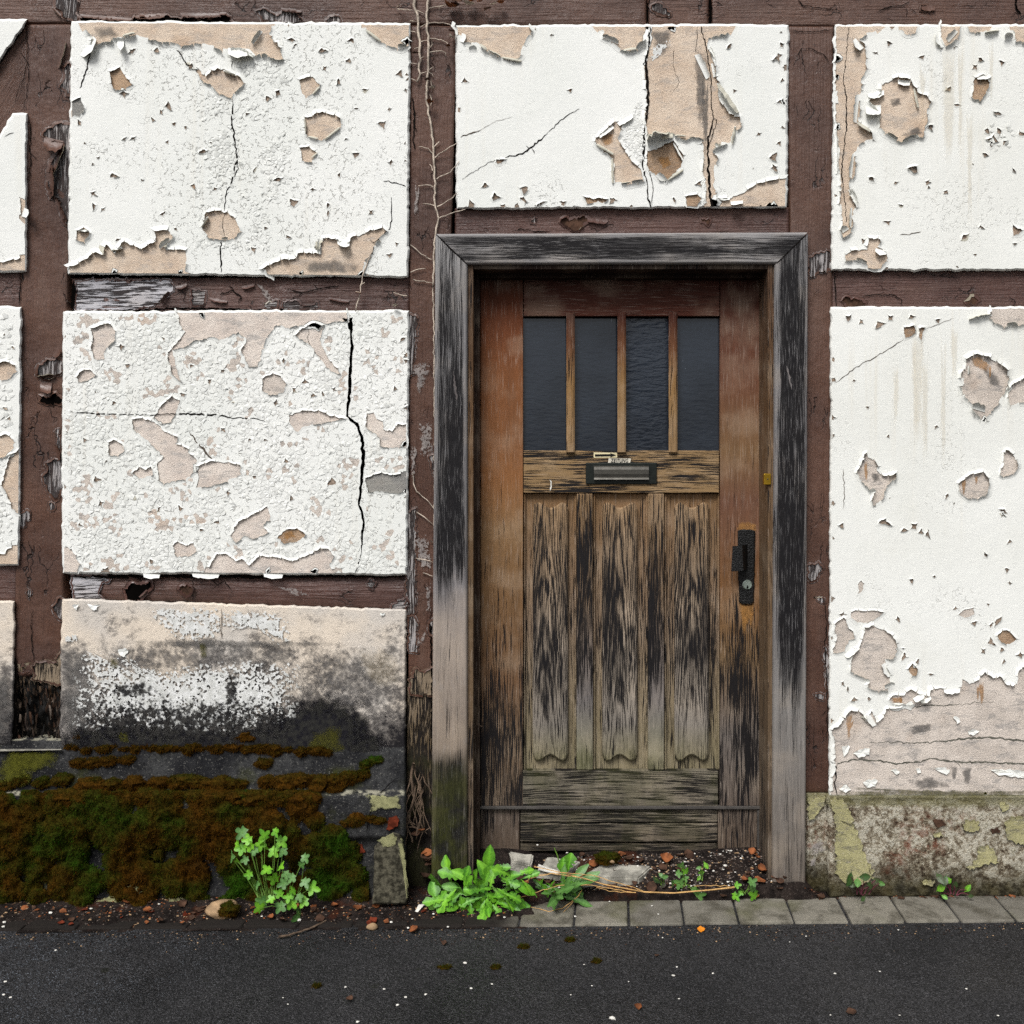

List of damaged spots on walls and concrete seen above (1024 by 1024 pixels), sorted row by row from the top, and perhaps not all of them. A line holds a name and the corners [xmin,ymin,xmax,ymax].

crack [70,99,339,312]
crack [463,109,578,179]
peeling [481,0,788,233]
crack [641,0,717,207]
crack [795,1,849,222]
peeling [808,26,1024,279]
peeling [0,313,31,564]
peeling [34,0,433,698]
crack [71,317,405,638]
peeling [957,349,1024,427]
leakage [66,639,395,754]
peeling [813,579,1024,794]